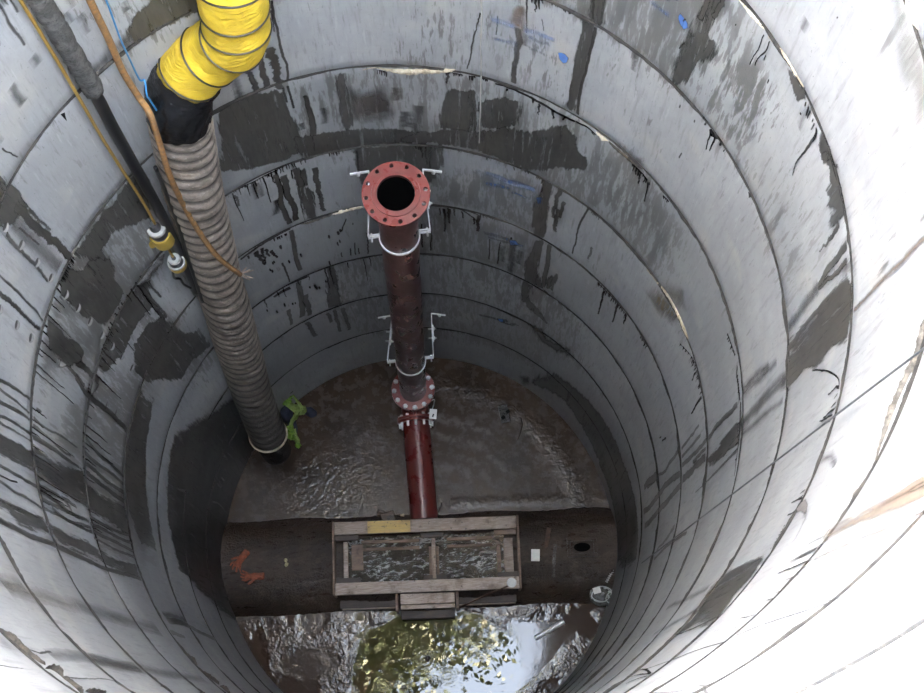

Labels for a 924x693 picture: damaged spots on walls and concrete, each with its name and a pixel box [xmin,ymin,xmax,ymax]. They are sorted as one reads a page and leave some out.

leakage [671,0,724,85]
leakage [789,70,806,115]
leakage [217,0,605,337]
leakage [819,133,844,252]
leakage [653,294,680,318]
leakage [779,241,853,391]
leakage [0,176,210,580]
leakage [524,367,772,567]
leakage [674,557,763,636]
leakage [630,641,726,682]